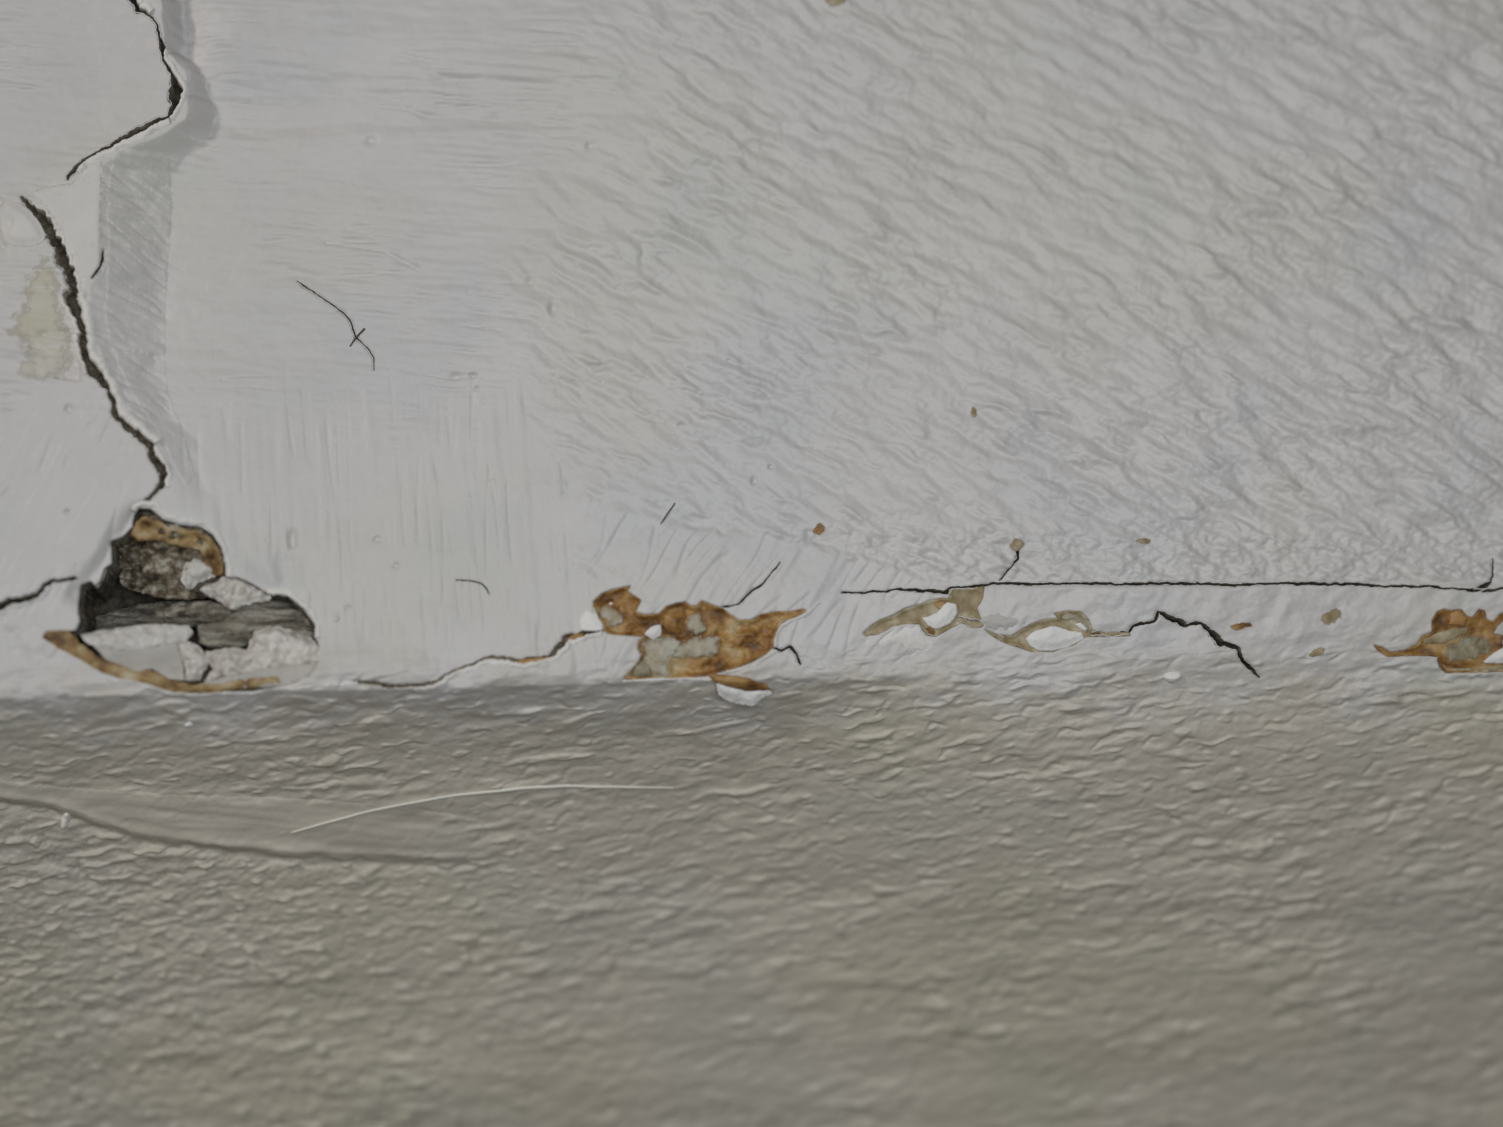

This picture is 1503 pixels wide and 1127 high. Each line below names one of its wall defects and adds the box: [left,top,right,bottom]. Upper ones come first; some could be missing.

crack [19,0,192,512]
crack [0,576,76,616]
spalling [43,500,358,697]
crack [354,630,601,694]
peeling [567,586,820,707]
peeling [863,586,1130,652]
crack [841,549,1503,679]